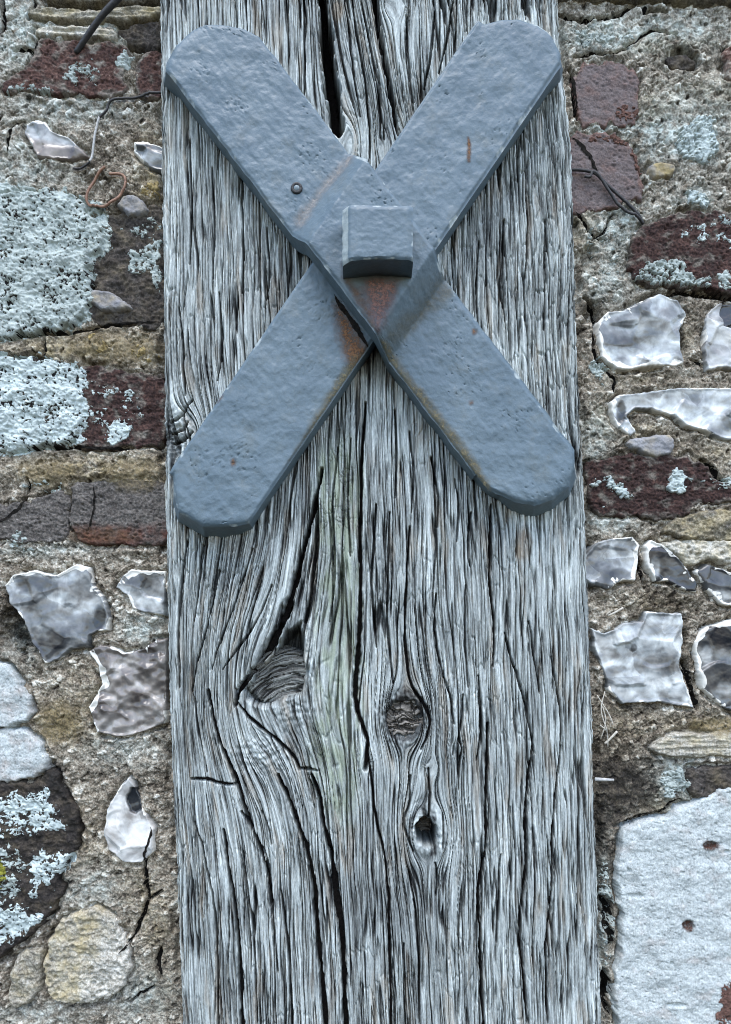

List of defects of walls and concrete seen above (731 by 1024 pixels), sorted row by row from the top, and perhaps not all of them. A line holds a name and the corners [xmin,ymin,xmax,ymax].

crack [319,0,340,138]
corrosion [349,279,396,326]
corrosion [338,309,365,363]
crack [118,827,163,954]
crack [134,946,163,998]